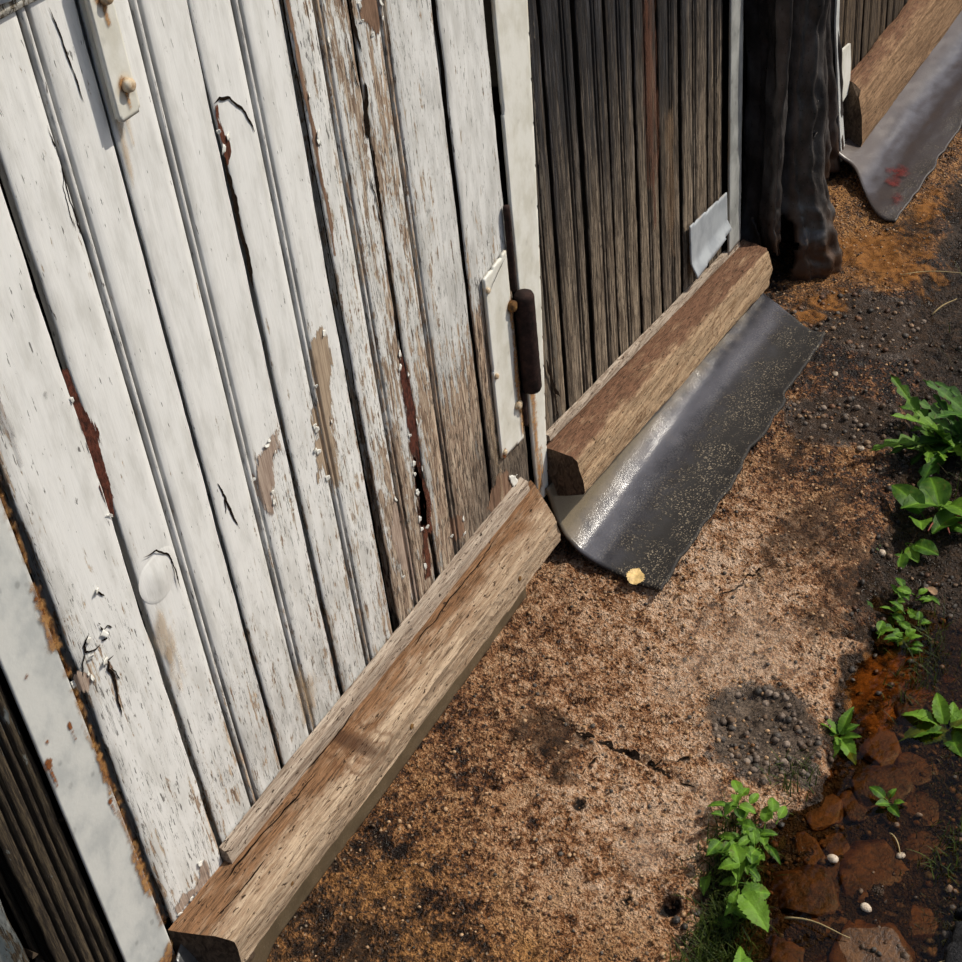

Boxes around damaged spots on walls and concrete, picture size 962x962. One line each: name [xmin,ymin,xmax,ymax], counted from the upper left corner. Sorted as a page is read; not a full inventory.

peeling [358,0,384,38]
crack [214,96,255,132]
crack [224,157,254,289]
peeling [309,325,340,489]
peeling [252,432,282,517]
crack [553,718,695,787]